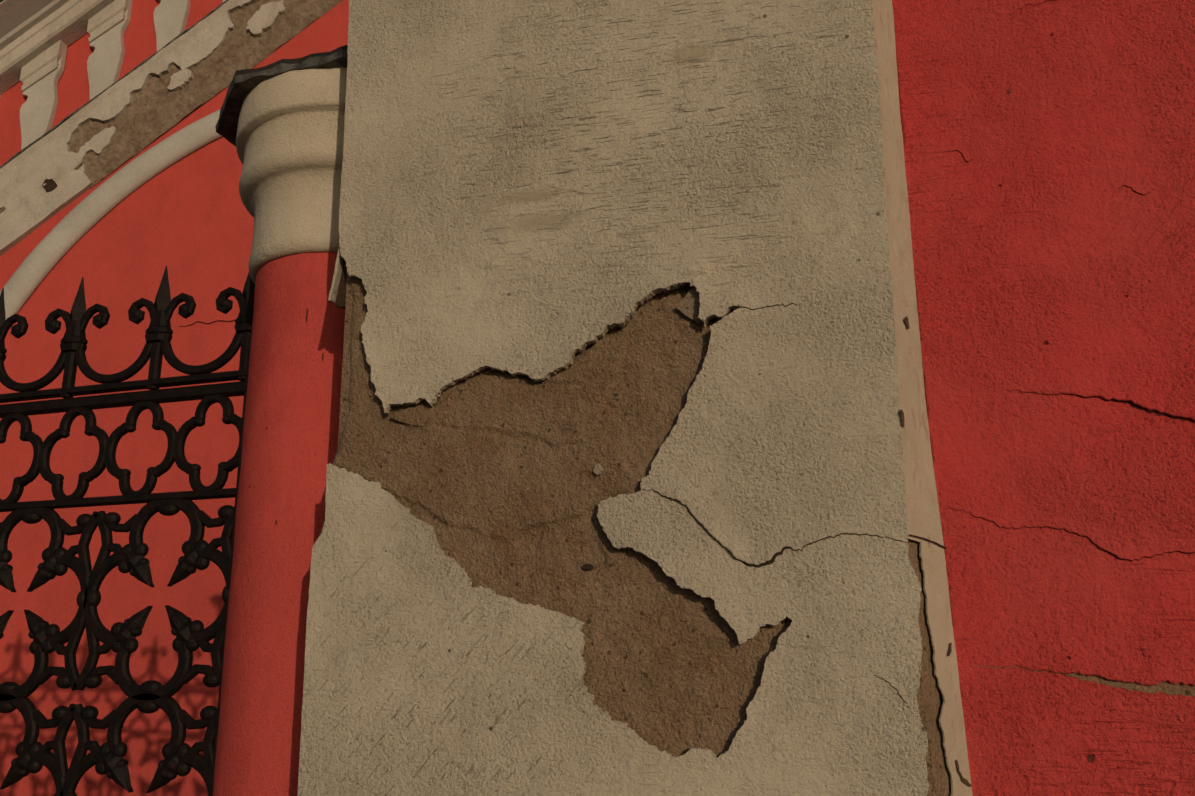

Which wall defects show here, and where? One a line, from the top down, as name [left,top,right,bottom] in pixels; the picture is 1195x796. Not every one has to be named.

peeling [42,179,57,192]
flaking render [69,0,343,188]
crack [1006,366,1195,423]
spalling [328,245,793,758]
crack [642,475,946,568]
spalling [908,539,951,796]